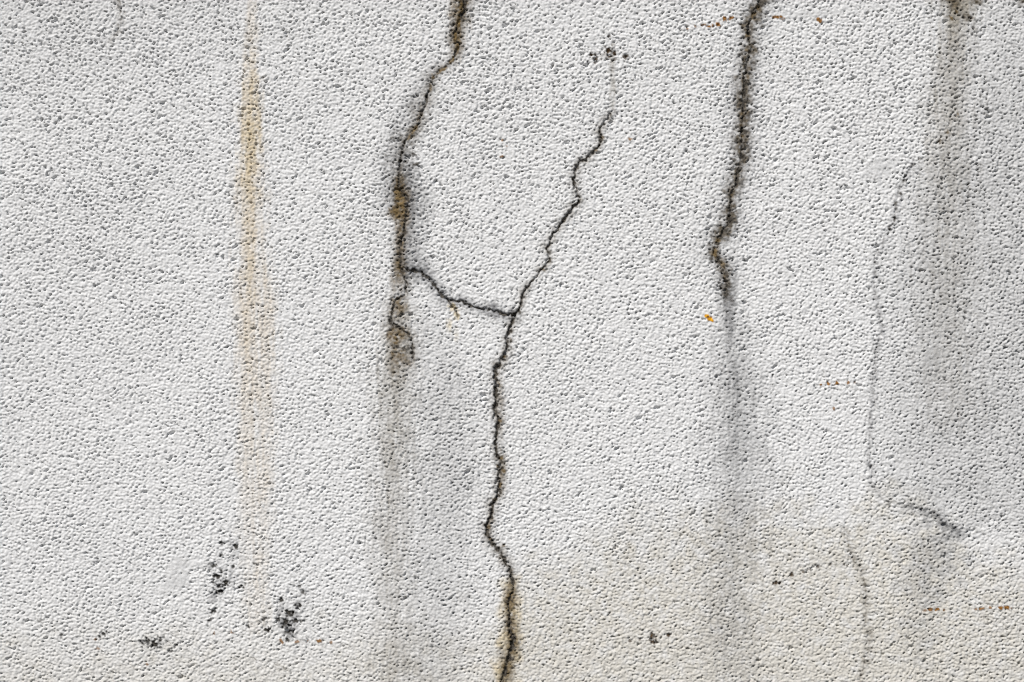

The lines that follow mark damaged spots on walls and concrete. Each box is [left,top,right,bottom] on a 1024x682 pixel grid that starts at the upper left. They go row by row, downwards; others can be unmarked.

crack [708,0,767,296]
crack [387,0,609,682]
mould [211,541,244,594]
mould [262,585,304,642]